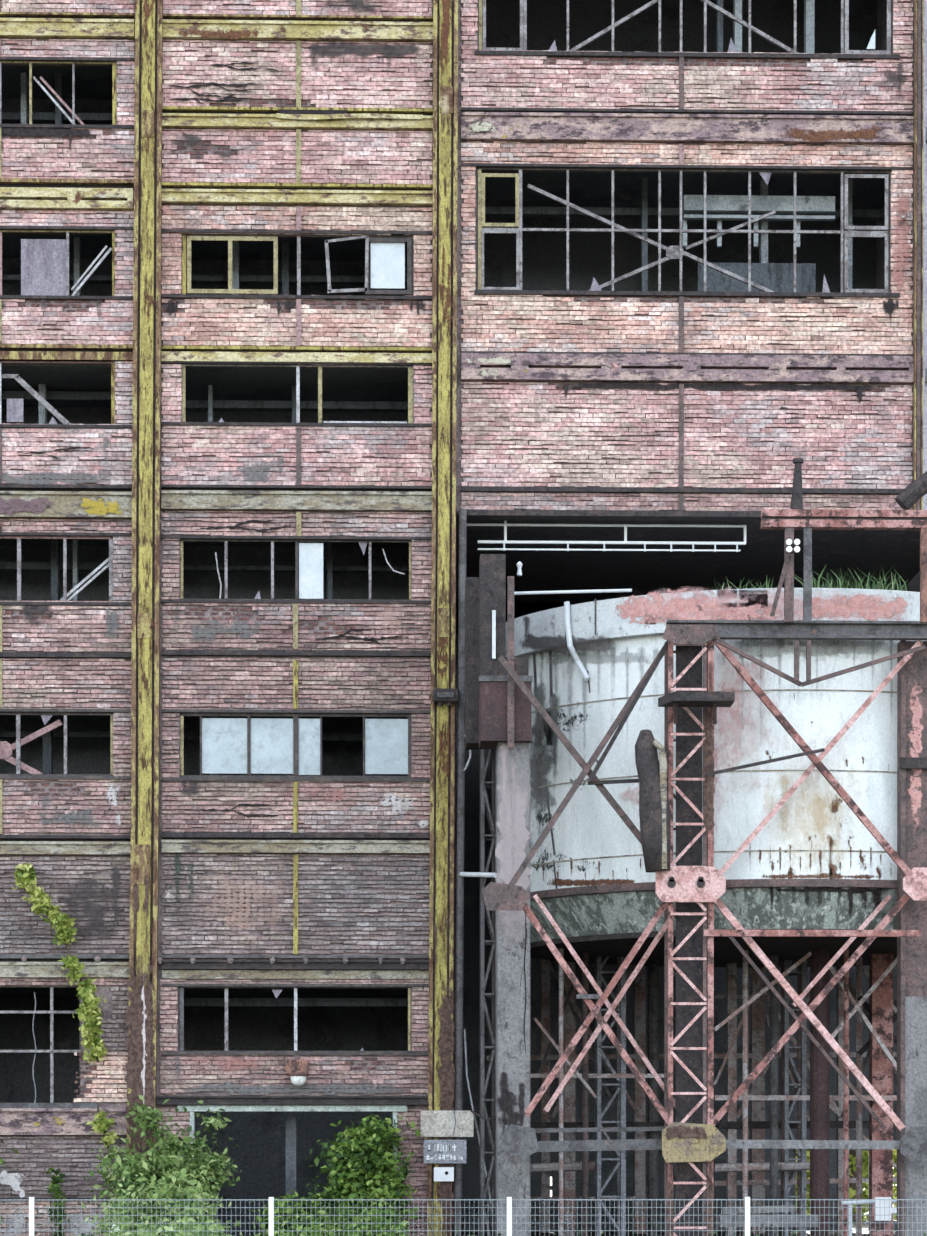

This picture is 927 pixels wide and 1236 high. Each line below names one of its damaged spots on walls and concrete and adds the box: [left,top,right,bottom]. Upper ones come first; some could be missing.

leakage [311,42,418,63]
corrosion [780,126,882,142]
peeling [81,497,122,516]
peeling [616,588,780,626]
peeling [801,594,908,621]
leakage [535,684,590,780]
corrosion [749,797,892,879]
leakage [531,847,598,872]
leakage [770,887,882,916]
leakage [497,1072,525,1132]